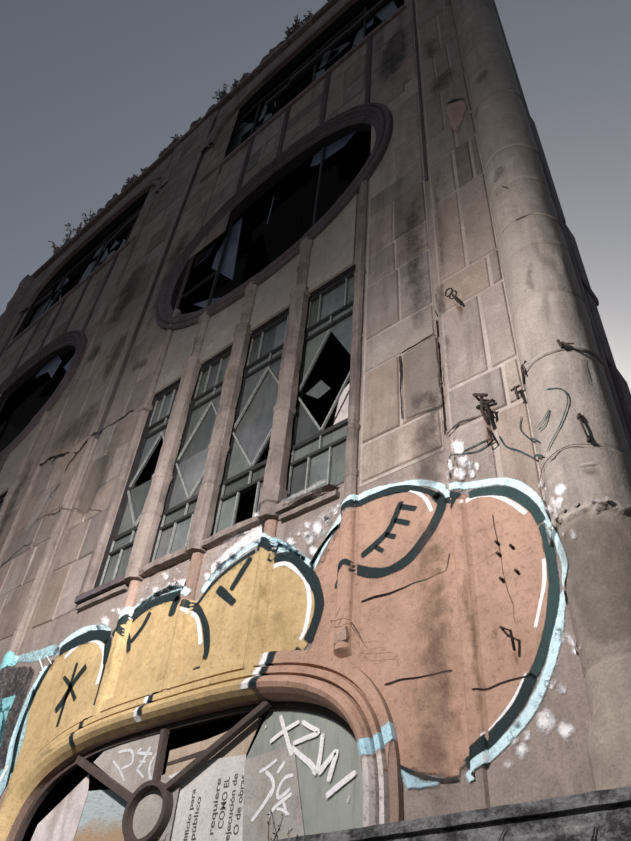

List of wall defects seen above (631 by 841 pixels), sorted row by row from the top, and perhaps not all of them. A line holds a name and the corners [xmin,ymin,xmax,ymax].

crack [35,410,134,520]